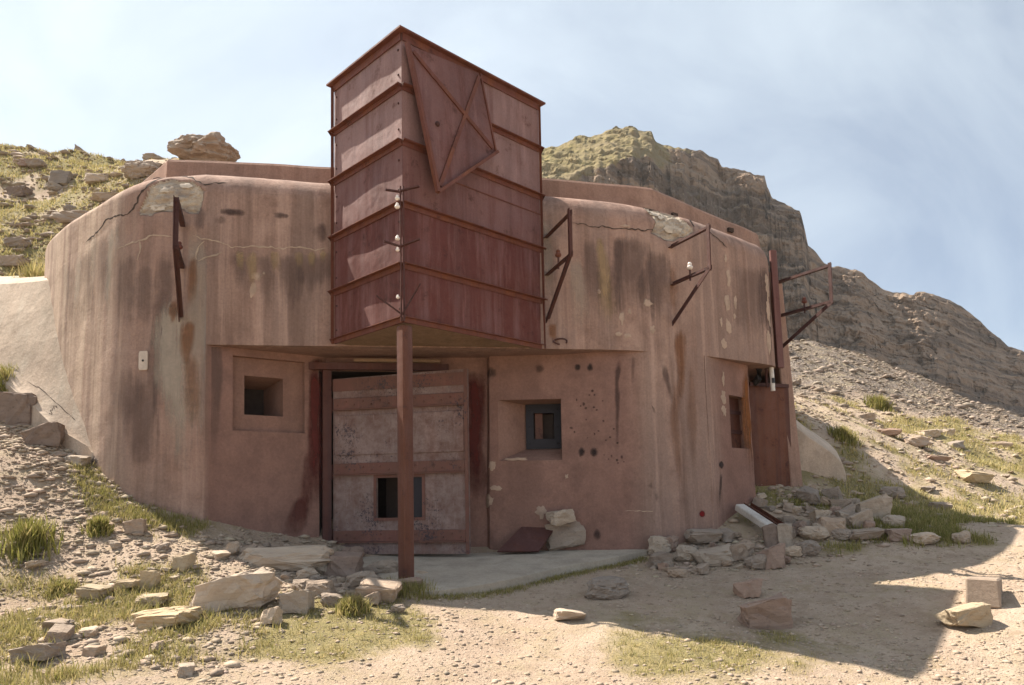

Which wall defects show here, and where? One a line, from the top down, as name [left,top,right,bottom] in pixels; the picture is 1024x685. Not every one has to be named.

crack [86,176,225,242]
spalling [139,179,203,216]
spalling [644,208,693,241]
peeling [720,255,737,349]
leakage [156,307,186,425]
rust [293,360,321,522]
rust [468,377,484,488]